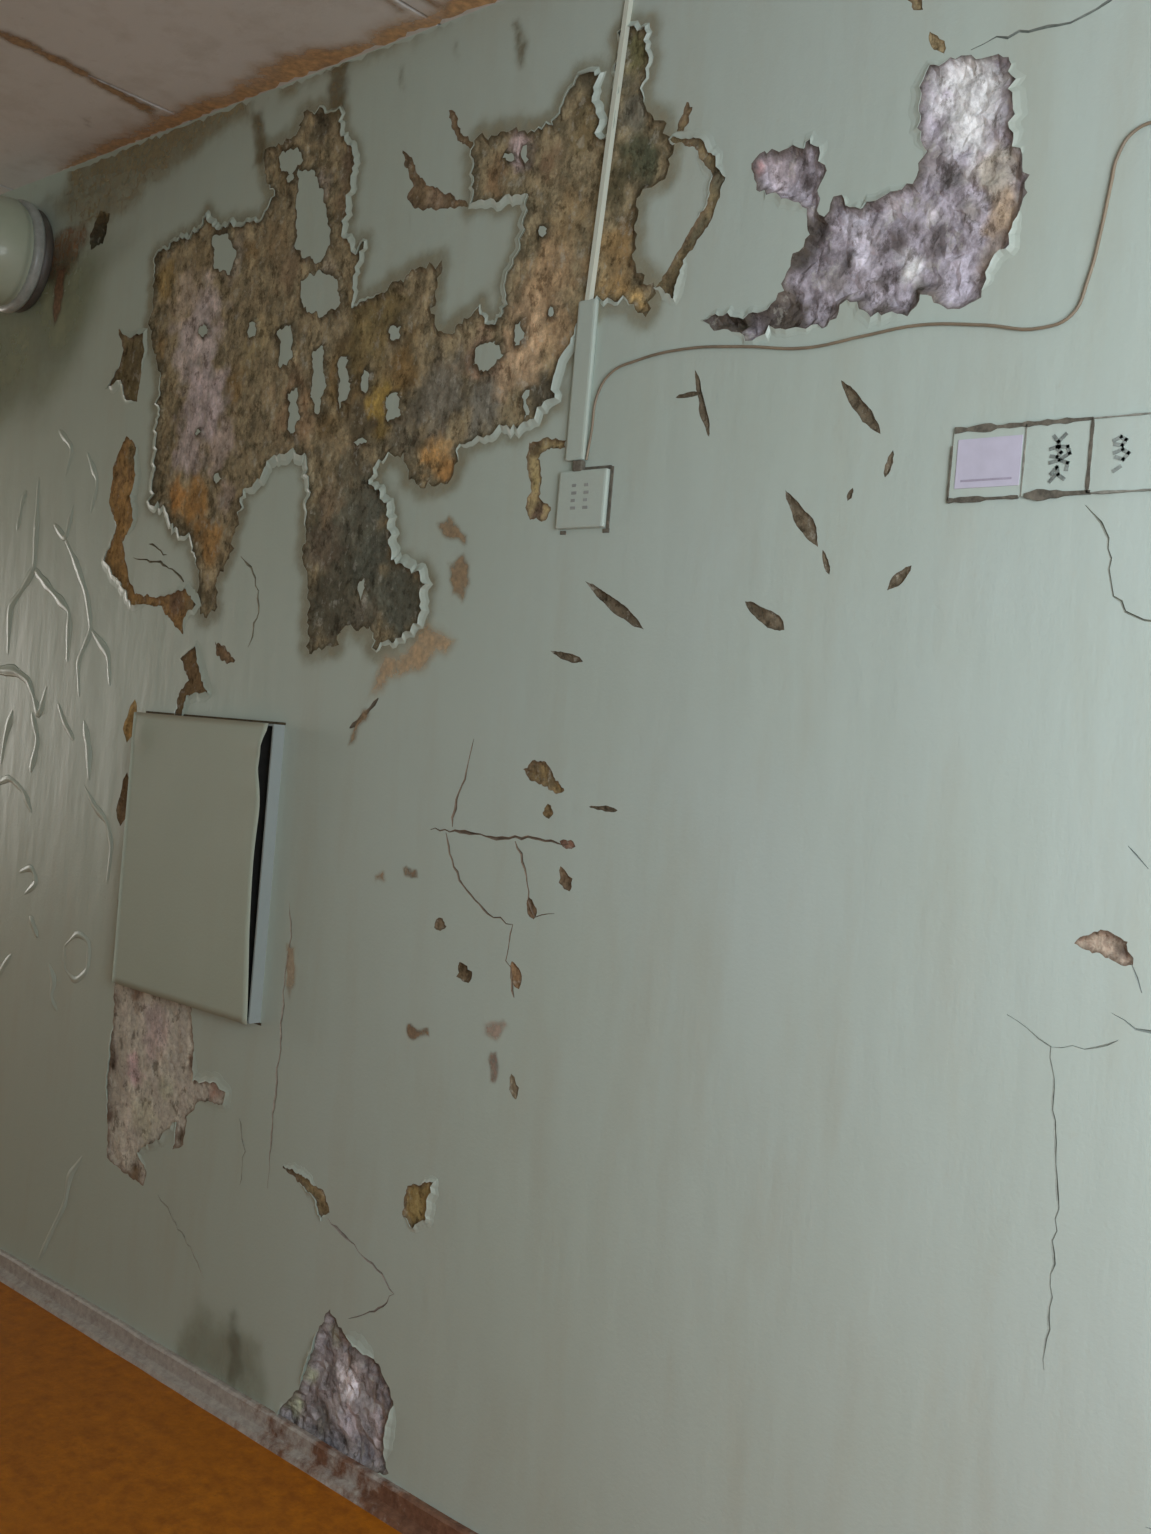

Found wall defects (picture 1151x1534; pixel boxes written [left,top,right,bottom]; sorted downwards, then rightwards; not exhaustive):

crack [971,0,1112,50]
flaking render [701,32,1029,345]
peeling [101,20,725,716]
peeling [841,381,880,433]
peeling [745,601,784,631]
peeling [786,491,830,574]
peeling [887,565,912,590]
crack [1085,505,1151,622]
crack [430,739,568,997]
peeling [104,983,231,1186]
crack [1007,965,1151,1367]
flaking render [273,1310,396,1475]